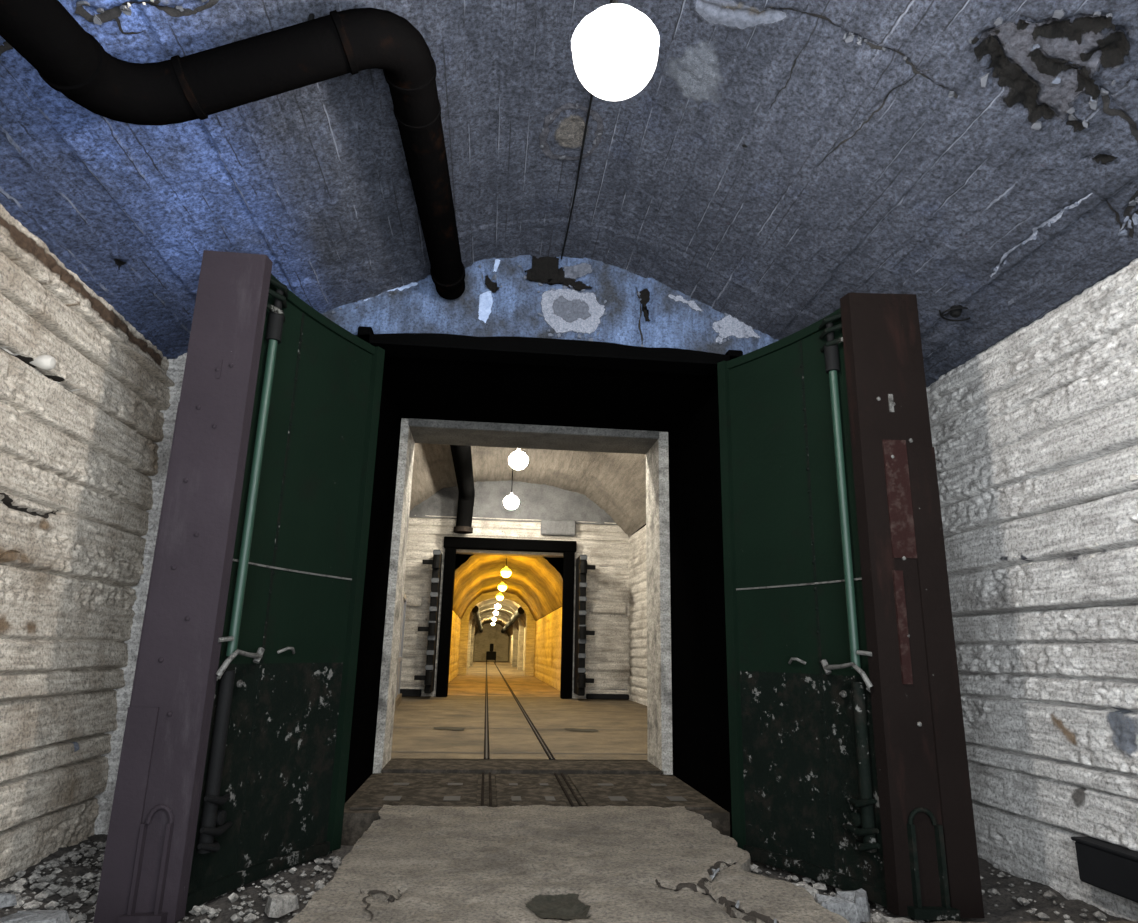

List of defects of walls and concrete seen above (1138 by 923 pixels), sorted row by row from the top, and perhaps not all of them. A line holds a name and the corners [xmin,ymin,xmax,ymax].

crack [75,0,219,35]
spalling [695,0,787,30]
spalling [969,9,1138,142]
spalling [1092,154,1118,165]
spalling [479,265,502,293]
peeling [518,256,607,341]
peeling [668,294,703,312]
peeling [712,313,761,345]
crack [0,493,58,519]
water stain [1107,707,1138,754]
crack [655,861,779,923]